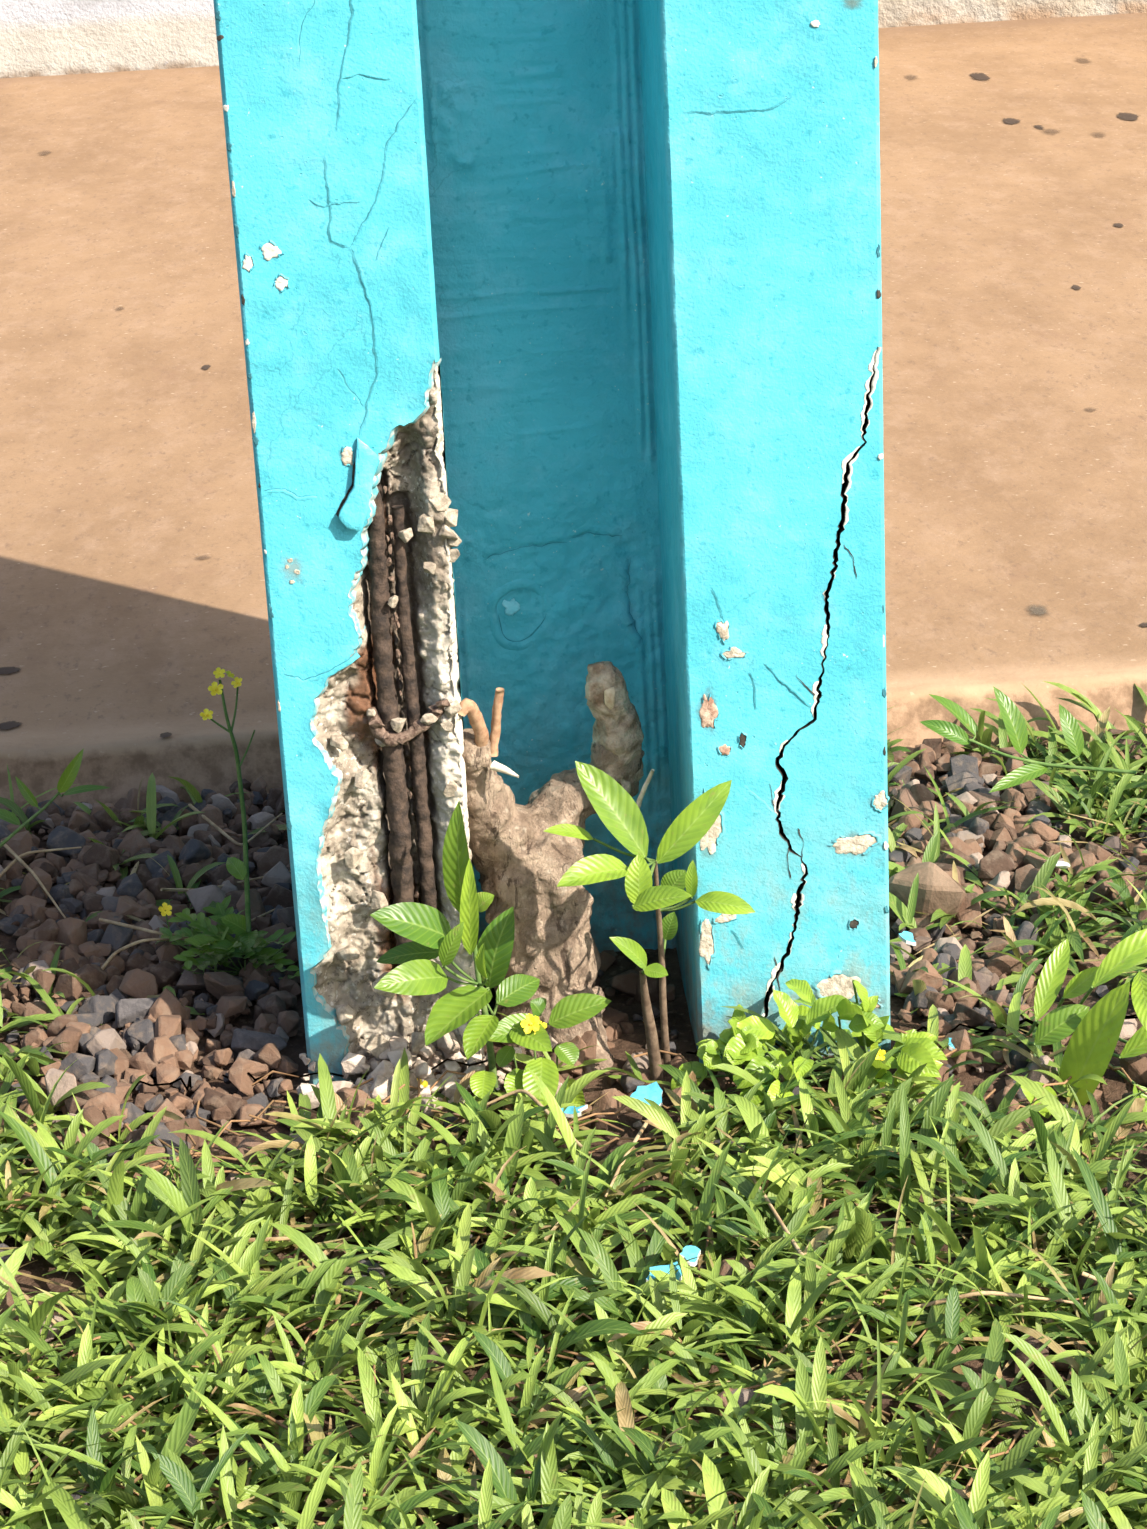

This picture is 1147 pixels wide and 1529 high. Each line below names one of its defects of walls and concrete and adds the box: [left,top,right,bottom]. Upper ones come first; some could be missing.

crack [296,0,420,438]
crack [711,588,759,623]
corrosion [346,638,394,766]
spalling [310,358,485,1083]
peeling [700,693,721,728]
crack [730,347,882,1018]
peeling [871,790,890,813]
peeling [700,811,726,854]
peeling [827,831,889,856]
corrosion [377,879,394,906]
corrosion [381,929,398,973]
peeling [699,914,736,971]